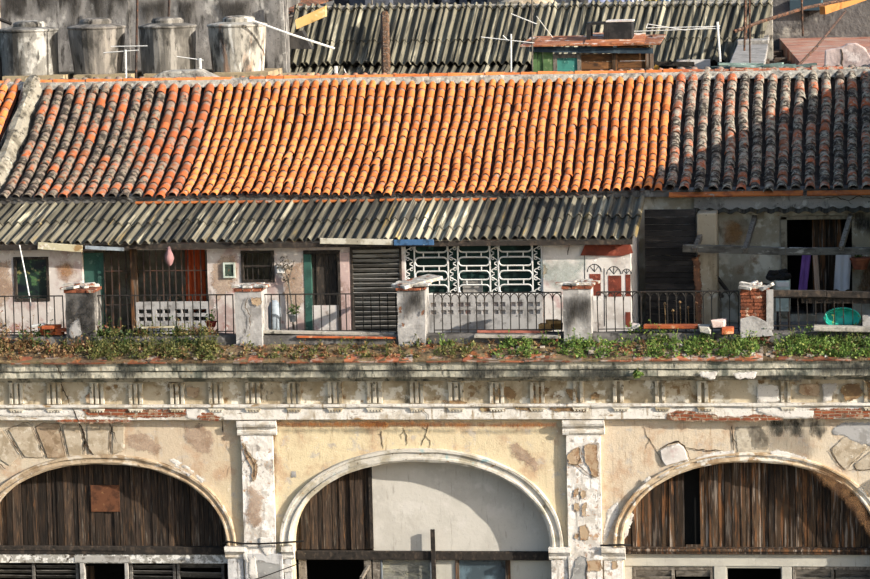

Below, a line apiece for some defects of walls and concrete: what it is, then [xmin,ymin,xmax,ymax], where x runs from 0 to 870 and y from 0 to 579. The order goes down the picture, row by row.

water stain [234,363,283,375]
water stain [295,364,363,378]
water stain [465,365,505,379]
water stain [569,366,626,379]
peeling [700,371,719,380]
peeling [733,371,780,403]
crack [0,364,117,468]
flaking render [0,386,220,466]
crack [379,410,431,448]
crack [645,426,738,462]
flaking render [644,410,807,483]
peeling [242,443,295,579]